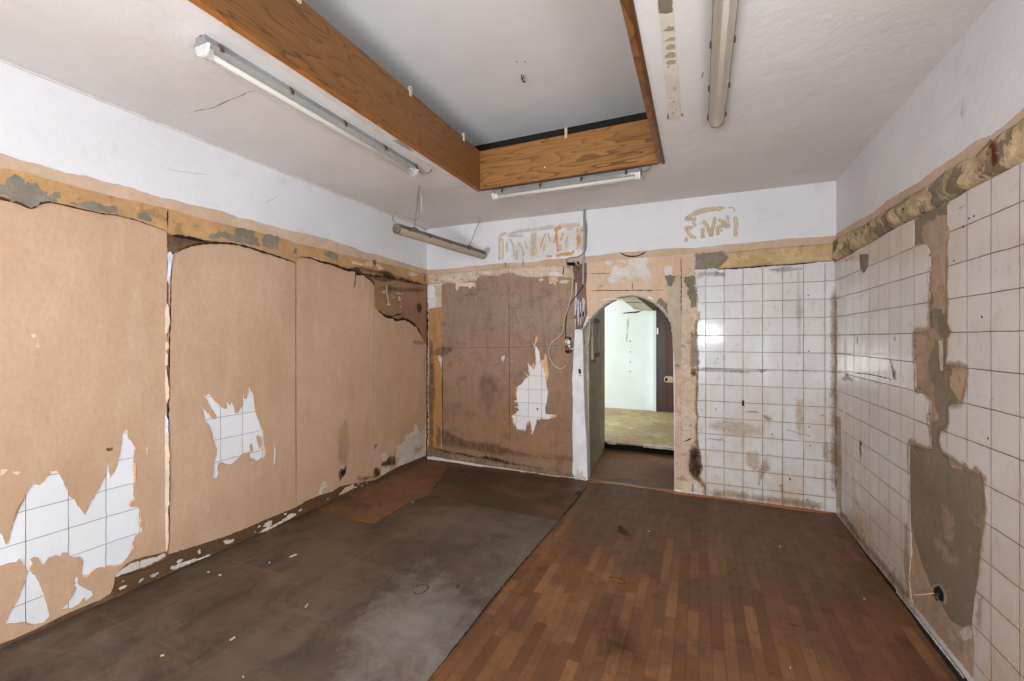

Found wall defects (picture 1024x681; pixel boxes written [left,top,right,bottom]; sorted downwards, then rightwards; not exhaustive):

crack [189,90,256,114]
peeling [351,260,442,345]
spalling [914,202,967,449]
peeling [512,336,556,434]
peeling [201,387,275,478]
peeling [380,424,483,476]
damp [689,448,700,482]
peeling [0,428,210,626]
peeling [254,509,302,534]
spalling [909,520,985,678]